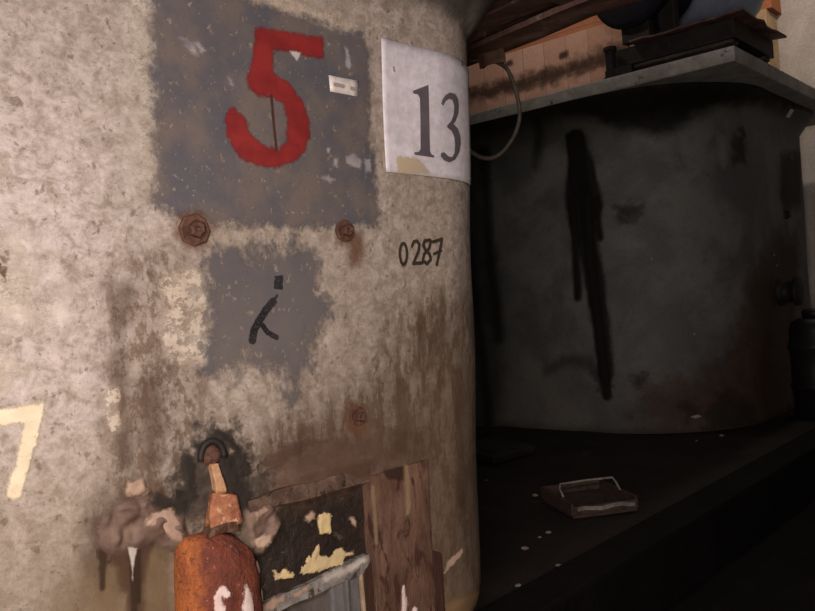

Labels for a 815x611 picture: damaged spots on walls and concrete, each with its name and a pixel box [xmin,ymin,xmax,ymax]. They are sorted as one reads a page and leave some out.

damp [131,263,157,318]
rust [341,233,362,262]
damp [565,130,613,400]
damp [120,323,252,511]
damp [328,270,480,580]
peeling [125,478,149,497]
peeling [145,508,184,542]
peeling [255,534,272,549]
damp [80,545,168,611]